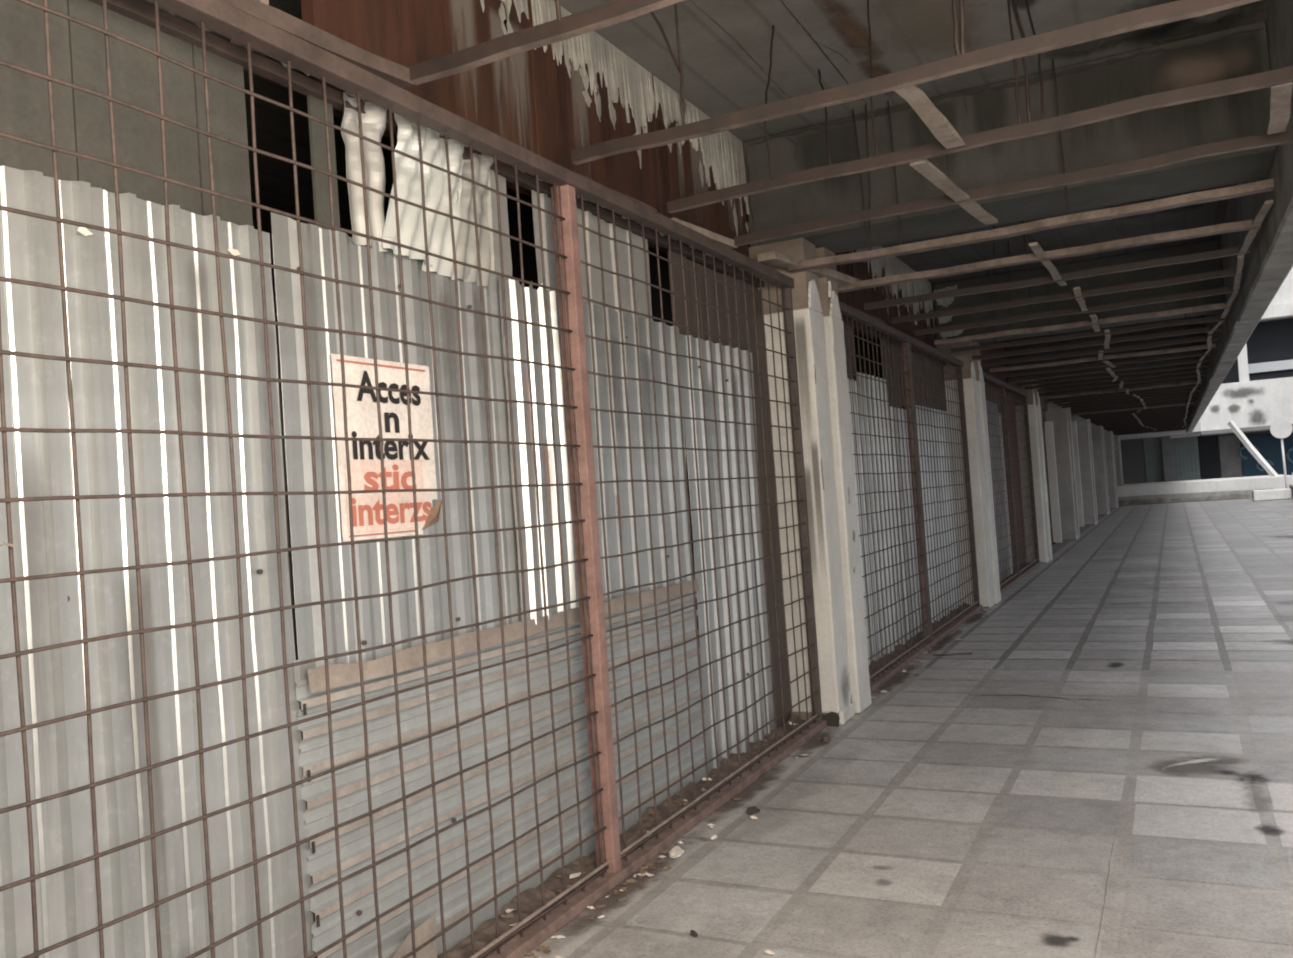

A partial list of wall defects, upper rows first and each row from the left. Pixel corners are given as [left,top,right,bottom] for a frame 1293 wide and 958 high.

peeling [480,0,571,35]
corrosion [545,44,566,133]
corrosion [599,75,620,142]
peeling [534,31,749,236]